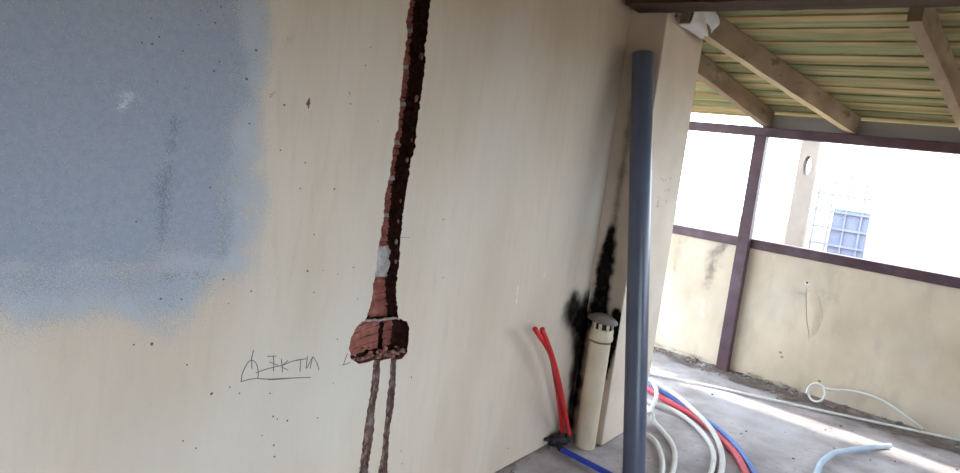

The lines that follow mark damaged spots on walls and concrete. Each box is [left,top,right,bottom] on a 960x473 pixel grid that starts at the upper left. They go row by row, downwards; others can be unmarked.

water stain [0,0,293,348]